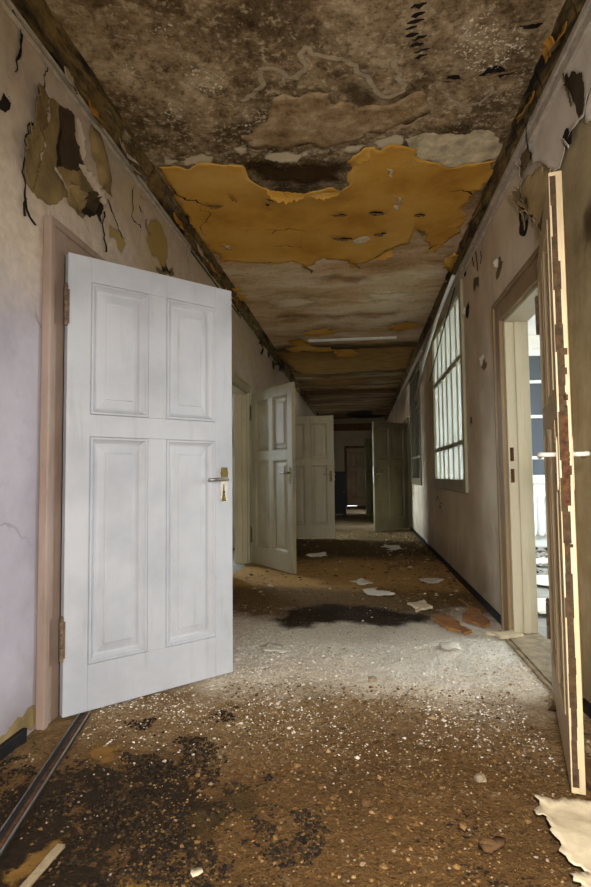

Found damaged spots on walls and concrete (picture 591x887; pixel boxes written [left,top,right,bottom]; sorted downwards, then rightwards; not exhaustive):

water stain [454,10,525,72]
water stain [240,45,409,133]
peeling [520,9,591,172]
peeling [25,83,107,224]
water stain [164,135,404,166]
peeling [159,91,503,274]
flaking render [156,264,174,277]
flaking render [493,256,503,280]